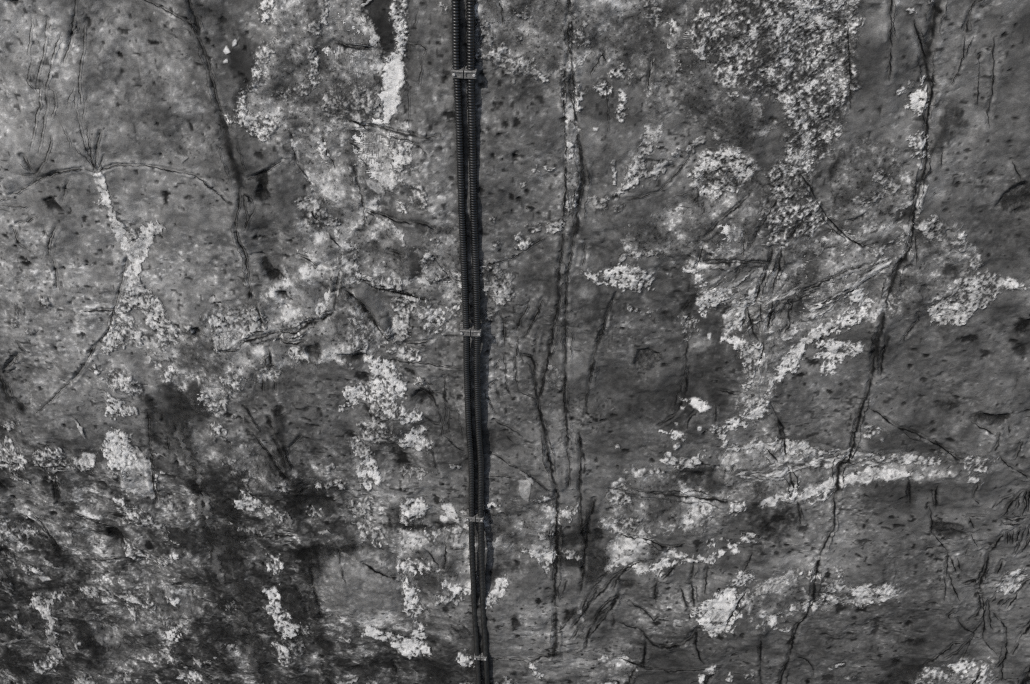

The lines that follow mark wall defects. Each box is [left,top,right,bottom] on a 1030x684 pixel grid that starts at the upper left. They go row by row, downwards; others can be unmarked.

leakage [372,0,408,127]
leakage [589,79,758,214]
leakage [689,0,864,174]
leakage [0,169,446,684]
crack [0,0,726,684]
crack [660,343,735,426]
leakage [584,214,1030,537]
crack [697,0,995,684]
leakage [388,497,466,532]
leakage [485,563,518,609]
leakage [689,567,903,638]
crack [905,424,1030,684]